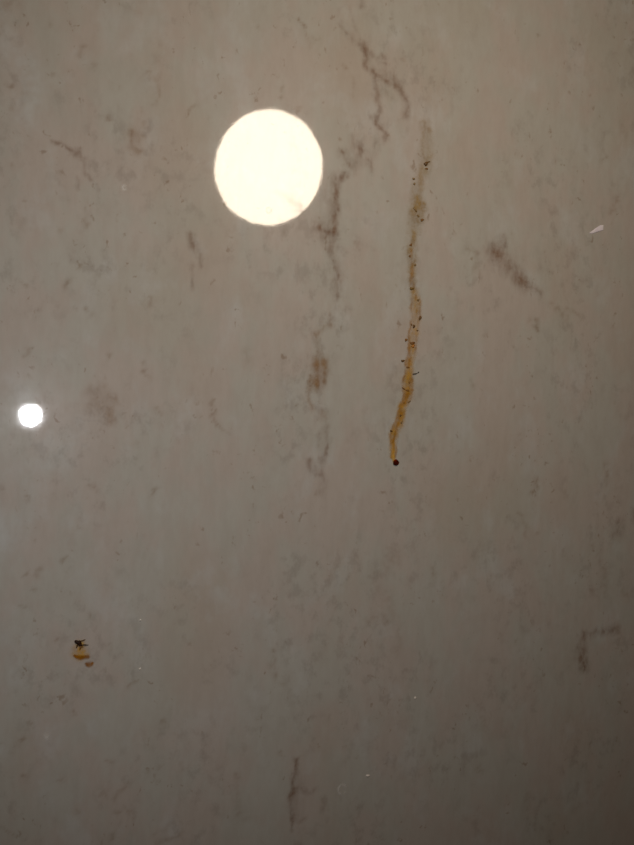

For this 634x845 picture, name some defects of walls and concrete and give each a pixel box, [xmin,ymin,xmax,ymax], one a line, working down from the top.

corrosion [390,339,419,465]